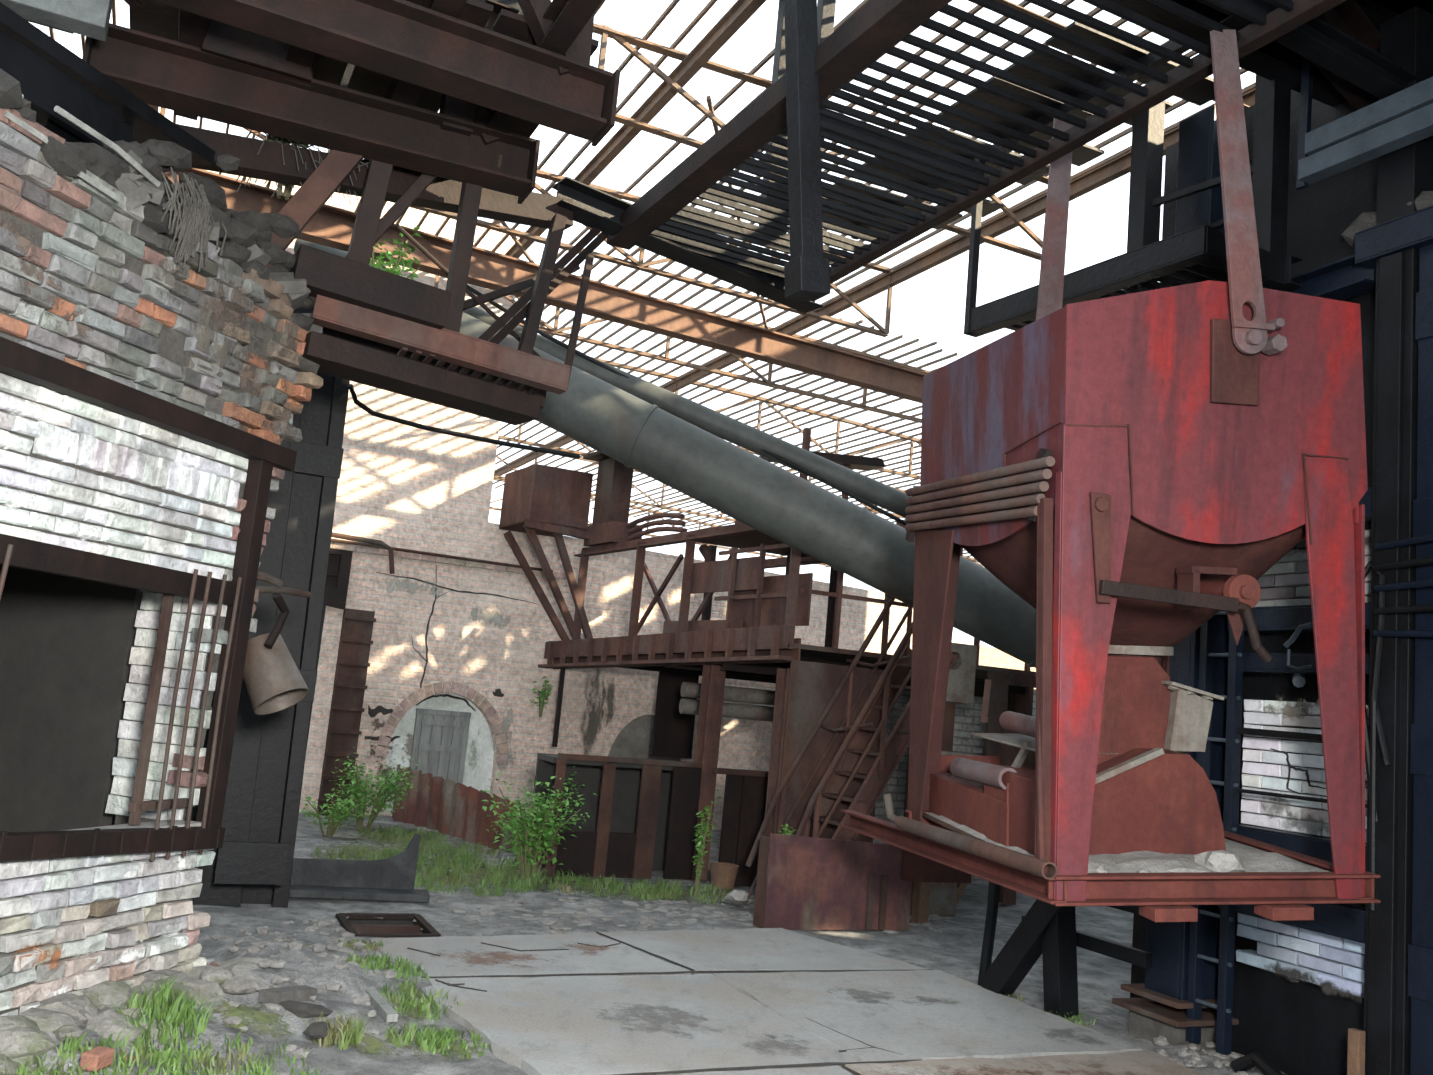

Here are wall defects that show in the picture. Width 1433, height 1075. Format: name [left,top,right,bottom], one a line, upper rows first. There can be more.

crack [375,565,539,711]
damp [581,670,614,754]
crack [1270,748,1326,795]